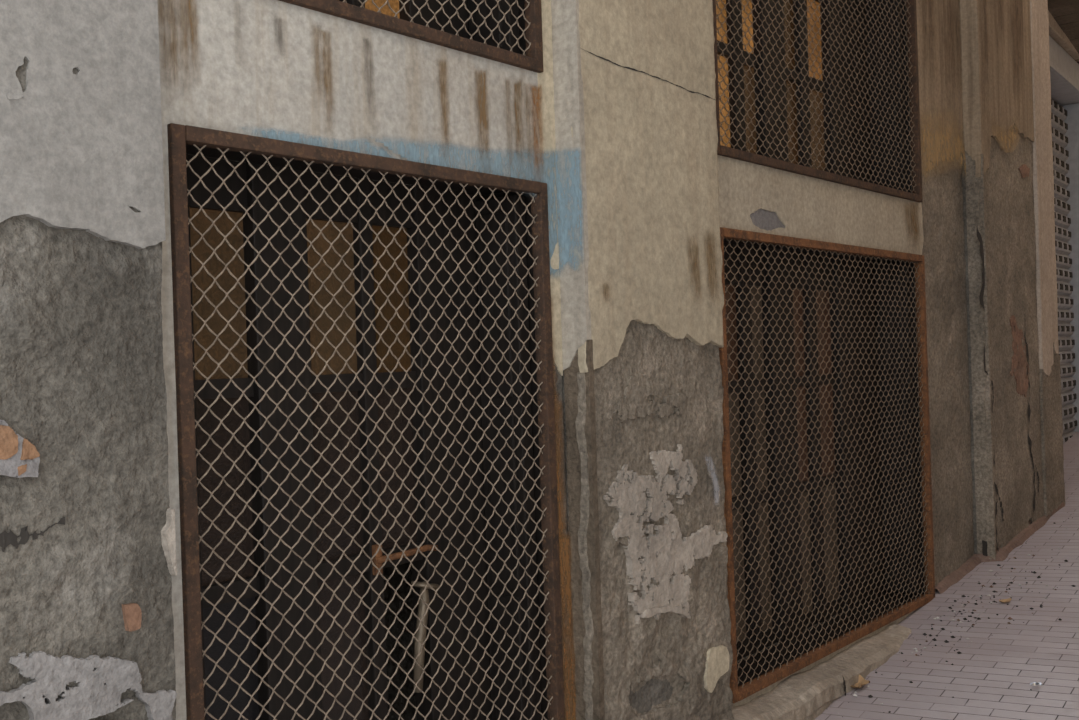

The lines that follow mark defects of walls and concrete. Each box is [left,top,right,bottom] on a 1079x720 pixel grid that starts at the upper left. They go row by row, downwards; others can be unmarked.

crack [581,48,715,100]
spalling [0,215,177,720]
spalling [553,320,734,720]
spalling [921,126,1065,591]